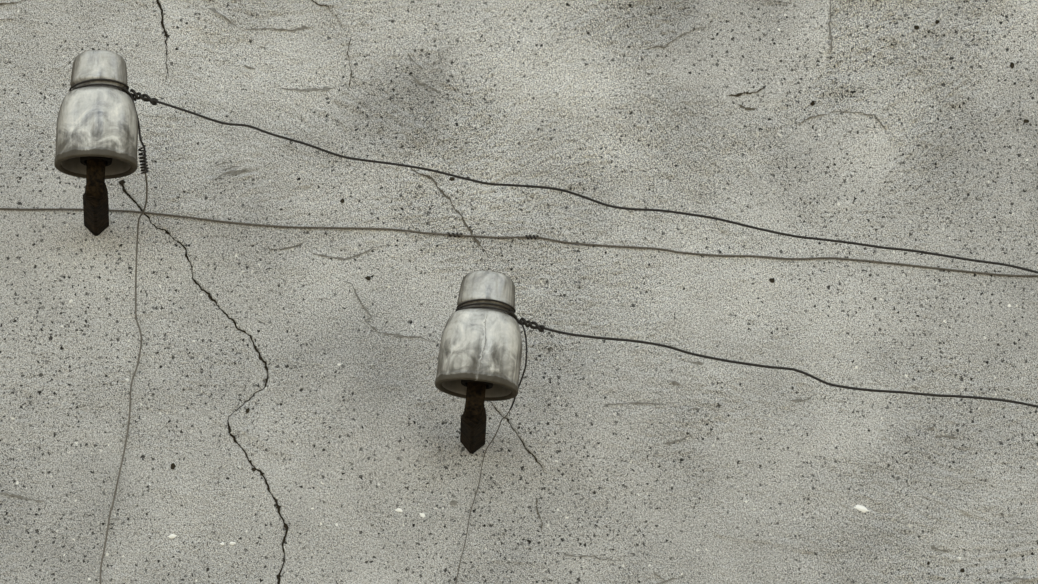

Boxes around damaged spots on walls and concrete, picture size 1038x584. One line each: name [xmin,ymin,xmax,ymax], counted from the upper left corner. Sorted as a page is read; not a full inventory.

crack [156,0,168,81]
crack [312,0,352,94]
crack [411,168,490,258]
crack [268,243,436,343]
crack [118,180,288,584]